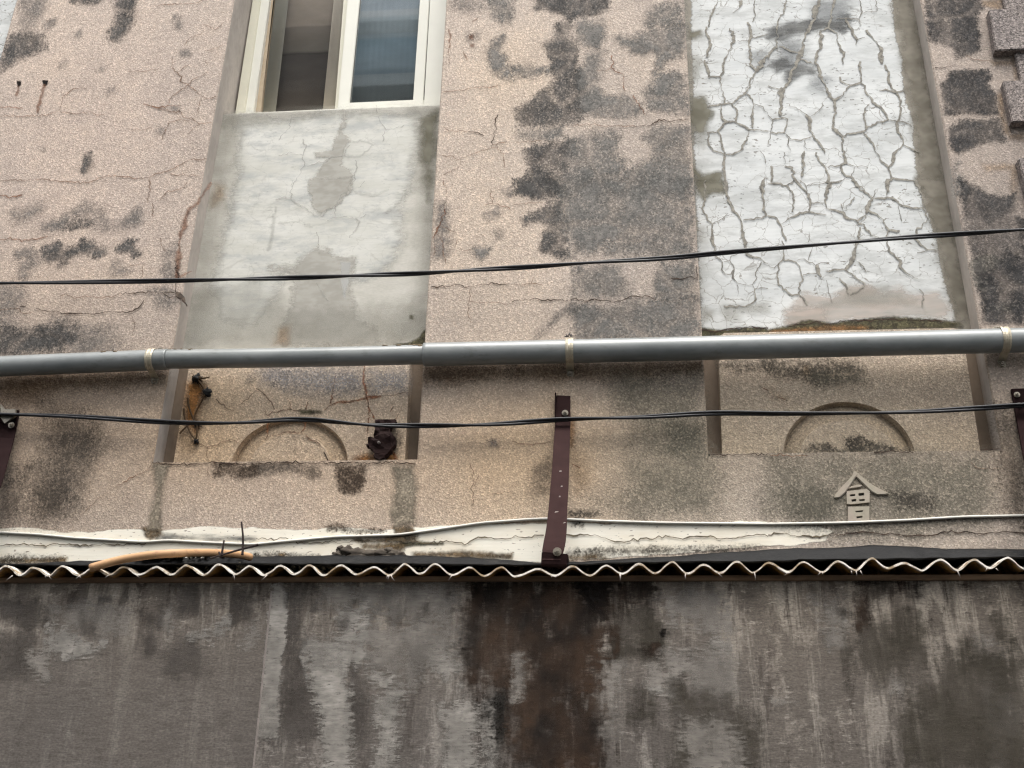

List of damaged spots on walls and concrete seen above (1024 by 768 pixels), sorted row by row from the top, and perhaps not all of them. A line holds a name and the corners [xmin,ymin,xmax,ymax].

crack [1,87,104,117]
damp [0,286,120,355]
mould [14,206,142,276]
crack [0,244,187,331]
crack [0,158,206,215]
crack [129,0,223,139]
crack [575,0,936,308]
damp [487,0,1024,339]
crack [152,366,415,476]
damp [334,464,366,495]
damp [326,523,765,768]
damp [841,567,1024,768]